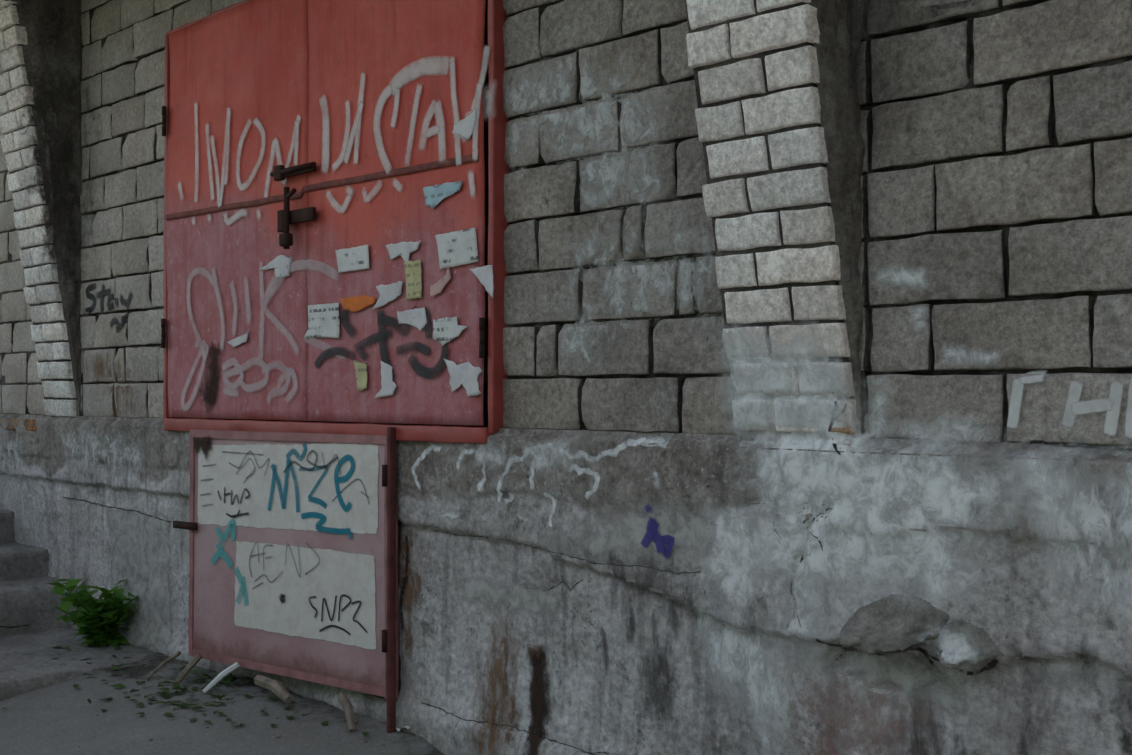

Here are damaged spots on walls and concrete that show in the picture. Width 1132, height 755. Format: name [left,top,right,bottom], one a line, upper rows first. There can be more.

water stain [505,62,660,218]
water stain [562,231,712,362]
water stain [878,267,924,286]
water stain [411,445,441,490]
water stain [456,437,668,527]
crack [1030,440,1132,451]
water stain [610,333,1132,749]
rust [477,630,516,755]
crack [421,702,609,755]
rust [523,646,549,755]
water stain [1121,728,1132,753]